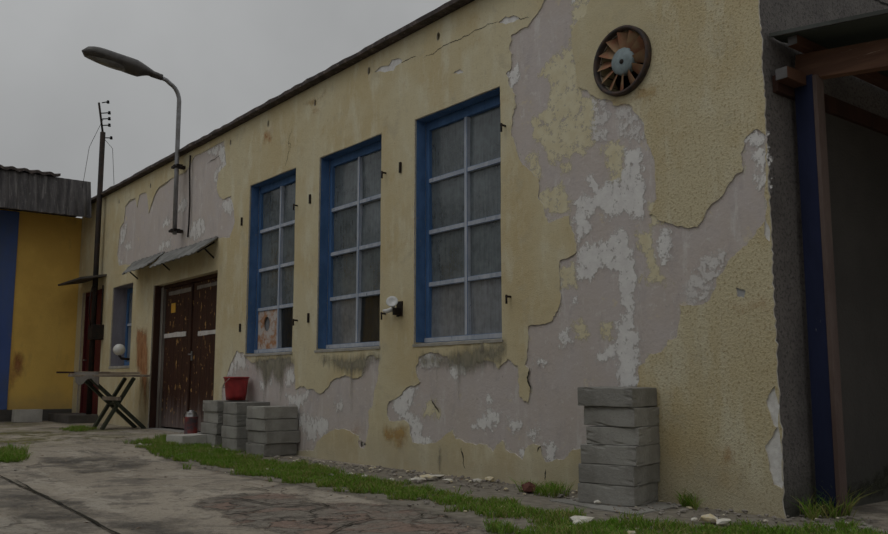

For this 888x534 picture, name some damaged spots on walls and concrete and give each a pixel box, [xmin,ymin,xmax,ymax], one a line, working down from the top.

flaking render [118,142,235,265]
flaking render [388,0,773,462]
flaking render [222,351,380,451]
flaking render [766,387,784,488]